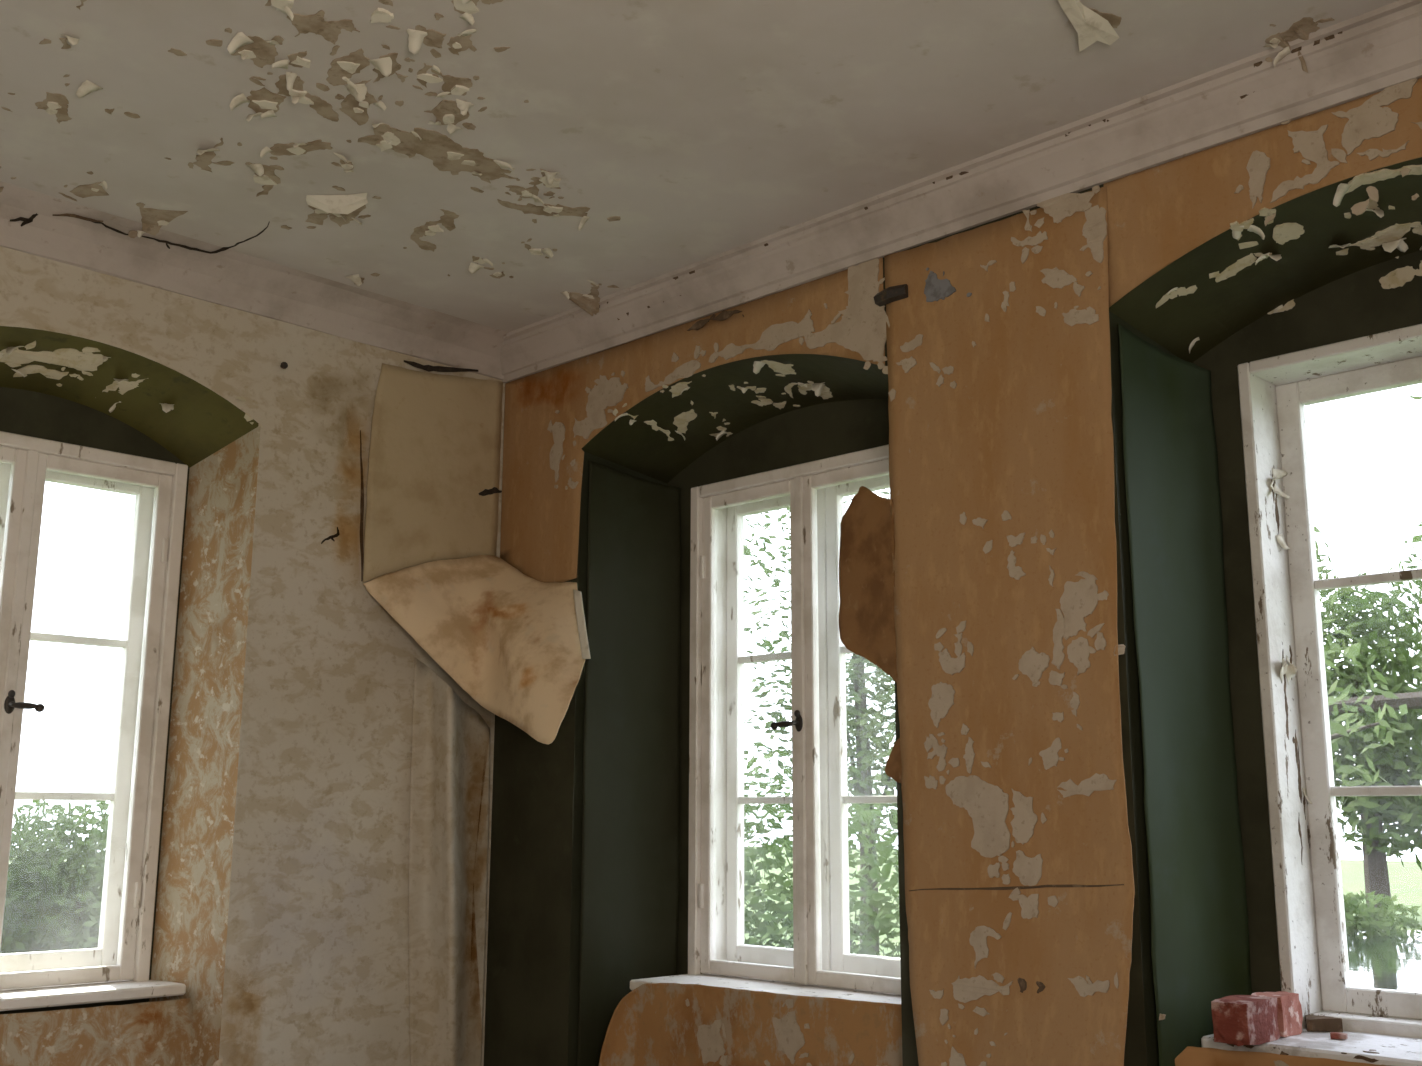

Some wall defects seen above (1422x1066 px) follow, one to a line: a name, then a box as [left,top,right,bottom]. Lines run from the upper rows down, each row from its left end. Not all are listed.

peeling [0,340,111,387]
peeling [95,373,149,413]
crack [10,213,270,254]
peeling [188,0,590,259]
peeling [547,258,957,490]
peeling [1011,185,1107,326]
peeling [1267,299,1295,314]
peeling [1156,78,1422,308]
peeling [960,510,1126,770]
peeling [924,621,1058,1066]
spalling [1251,991,1303,1066]
spalling [1330,1032,1380,1063]